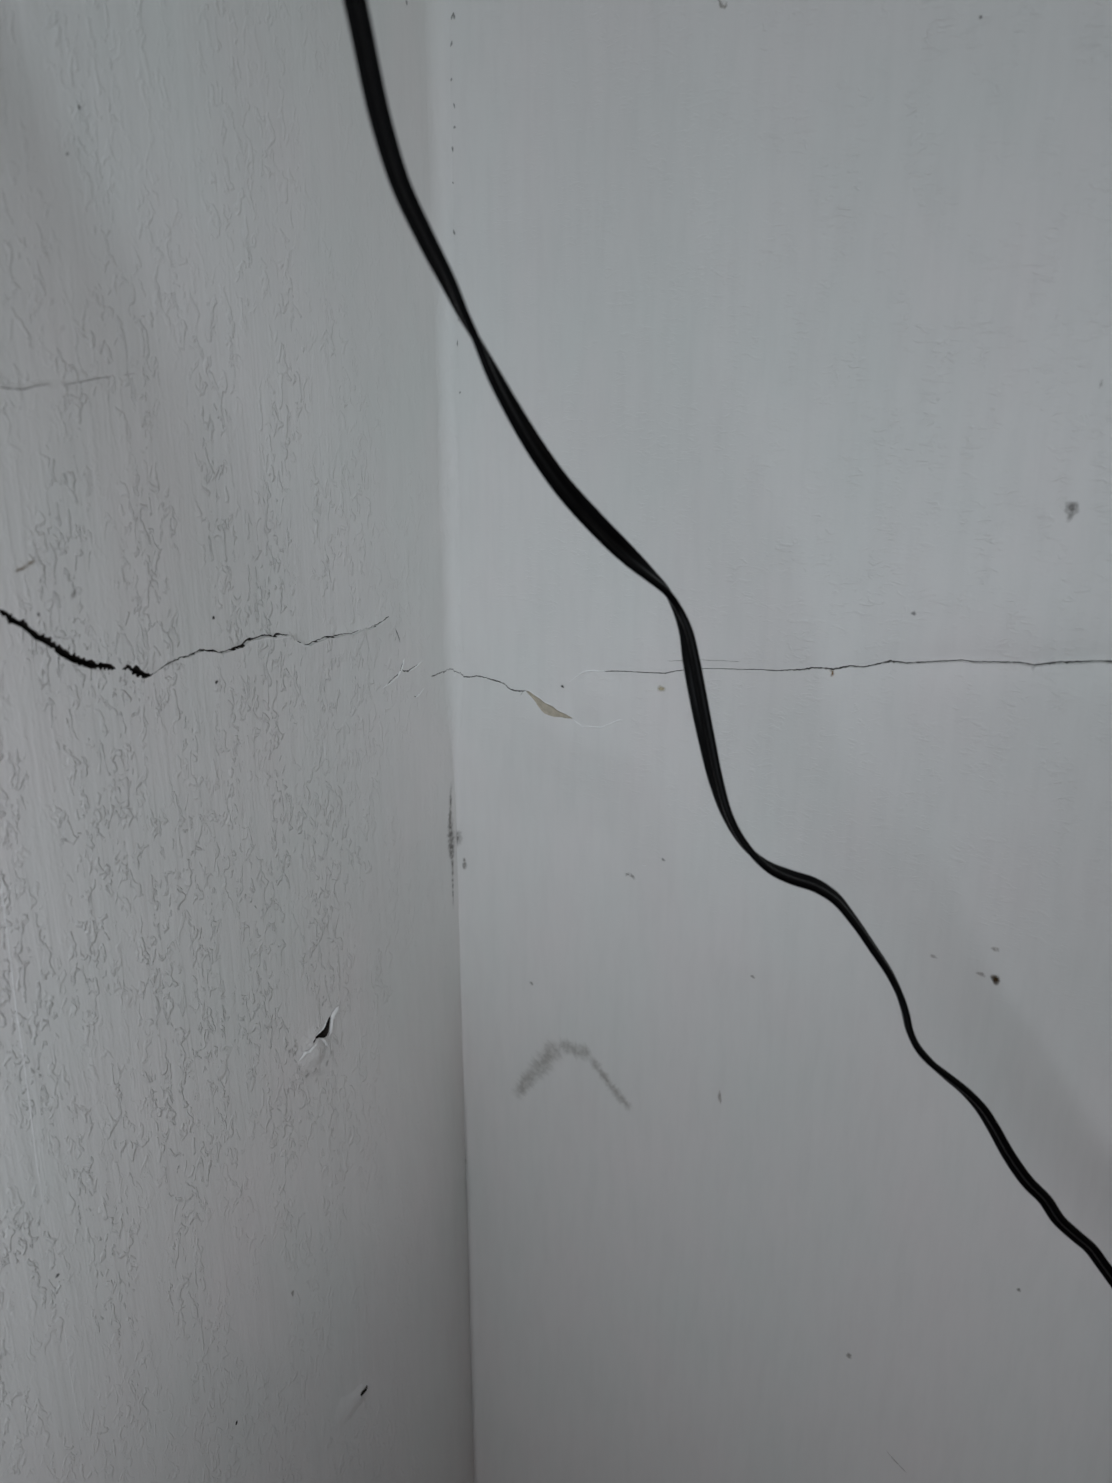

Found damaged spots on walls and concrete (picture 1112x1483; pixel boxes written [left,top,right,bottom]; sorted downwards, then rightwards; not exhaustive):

crack [0,609,525,698]
crack [605,659,1112,674]